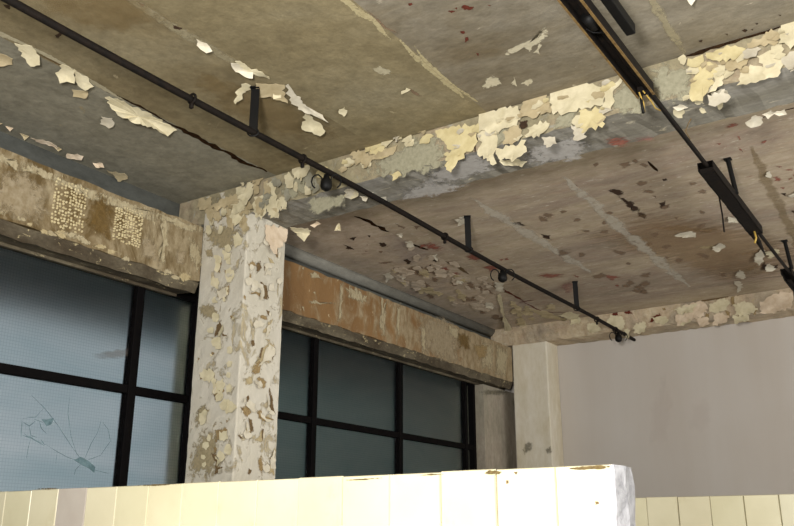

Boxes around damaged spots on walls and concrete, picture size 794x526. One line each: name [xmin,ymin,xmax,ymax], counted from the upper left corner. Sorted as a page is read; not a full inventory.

peeling [0,43,40,67]
peeling [0,123,83,160]
peeling [55,64,94,99]
peeling [100,97,177,136]
crack [107,92,268,172]
peeling [197,39,212,53]
peeling [231,61,327,136]
peeling [339,78,642,199]
peeling [652,22,794,118]
peeling [745,108,794,128]
peeling [379,223,794,339]
peeling [189,165,387,478]